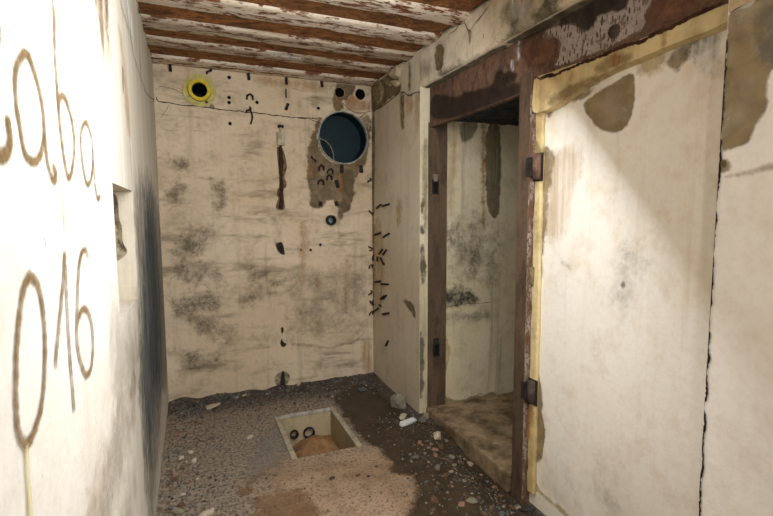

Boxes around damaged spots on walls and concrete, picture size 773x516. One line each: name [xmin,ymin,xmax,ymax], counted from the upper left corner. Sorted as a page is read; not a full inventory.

water stain [547,53,635,133]
peeling [542,0,652,66]
water stain [642,37,715,72]
water stain [721,0,773,150]
water stain [136,183,218,500]